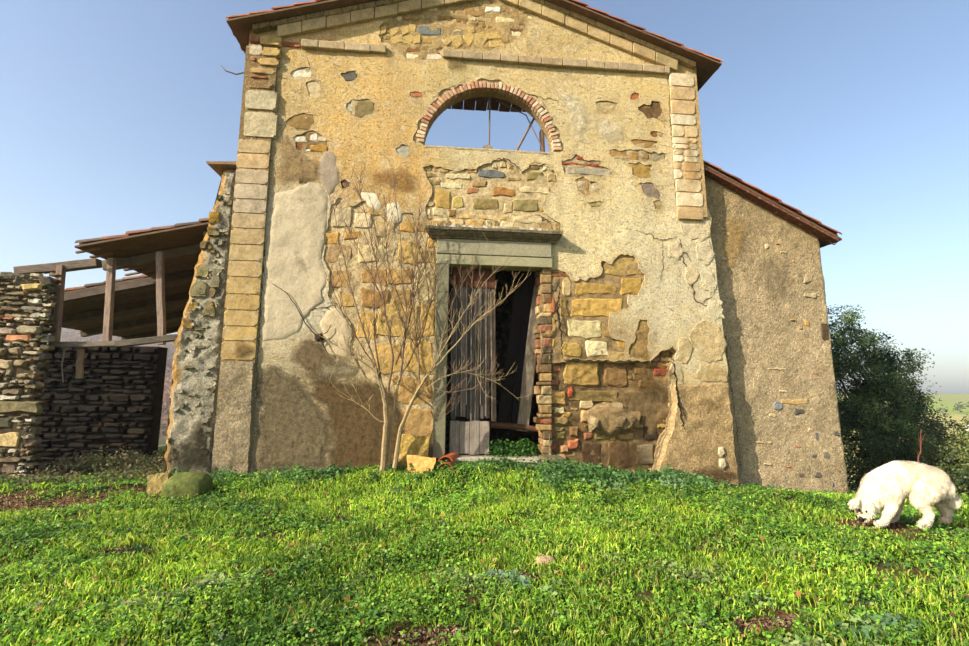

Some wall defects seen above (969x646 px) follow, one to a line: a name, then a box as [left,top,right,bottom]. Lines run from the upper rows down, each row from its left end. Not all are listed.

flaking render [379,0,532,61]
flaking render [286,114,328,152]
flaking render [346,99,375,118]
flaking render [596,100,617,112]
flaking render [630,93,662,119]
flaking render [320,131,665,448]
crack [637,230,713,306]
flaking render [538,224,728,472]
leakage [258,339,402,470]
crack [670,358,687,430]